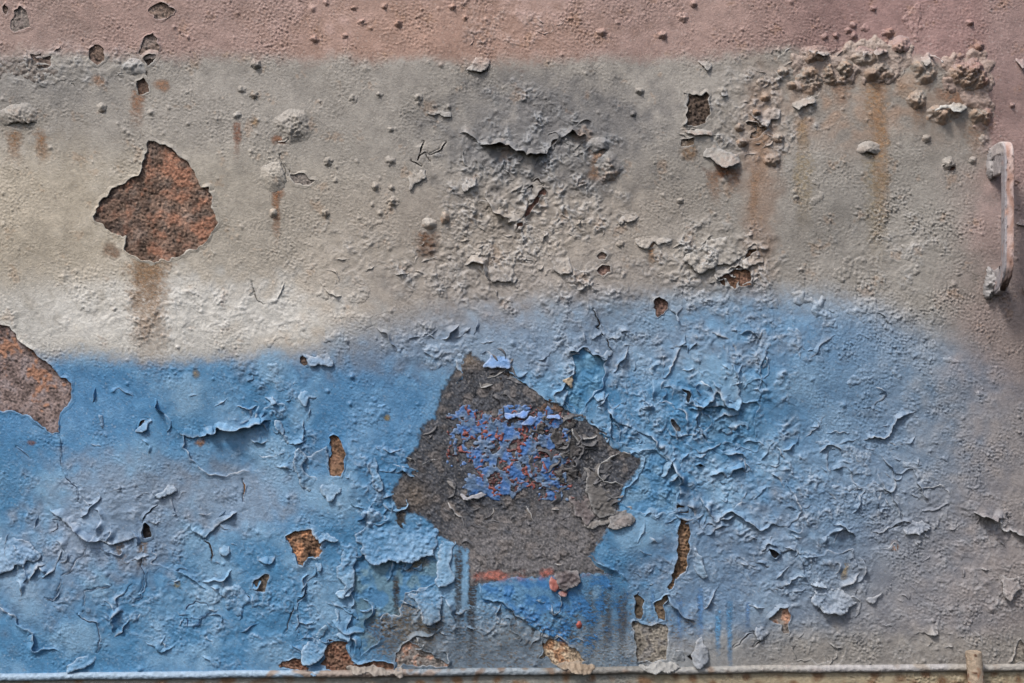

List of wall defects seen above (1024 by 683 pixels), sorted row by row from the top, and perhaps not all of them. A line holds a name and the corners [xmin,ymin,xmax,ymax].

peeling [677,47,824,168]
rust [734,123,785,167]
rust [752,91,771,116]
rust [89,136,222,316]
peeling [459,117,613,298]
peeling [135,353,558,679]
peeling [409,295,951,665]
peeling [557,660,595,675]
peeling [629,618,709,675]